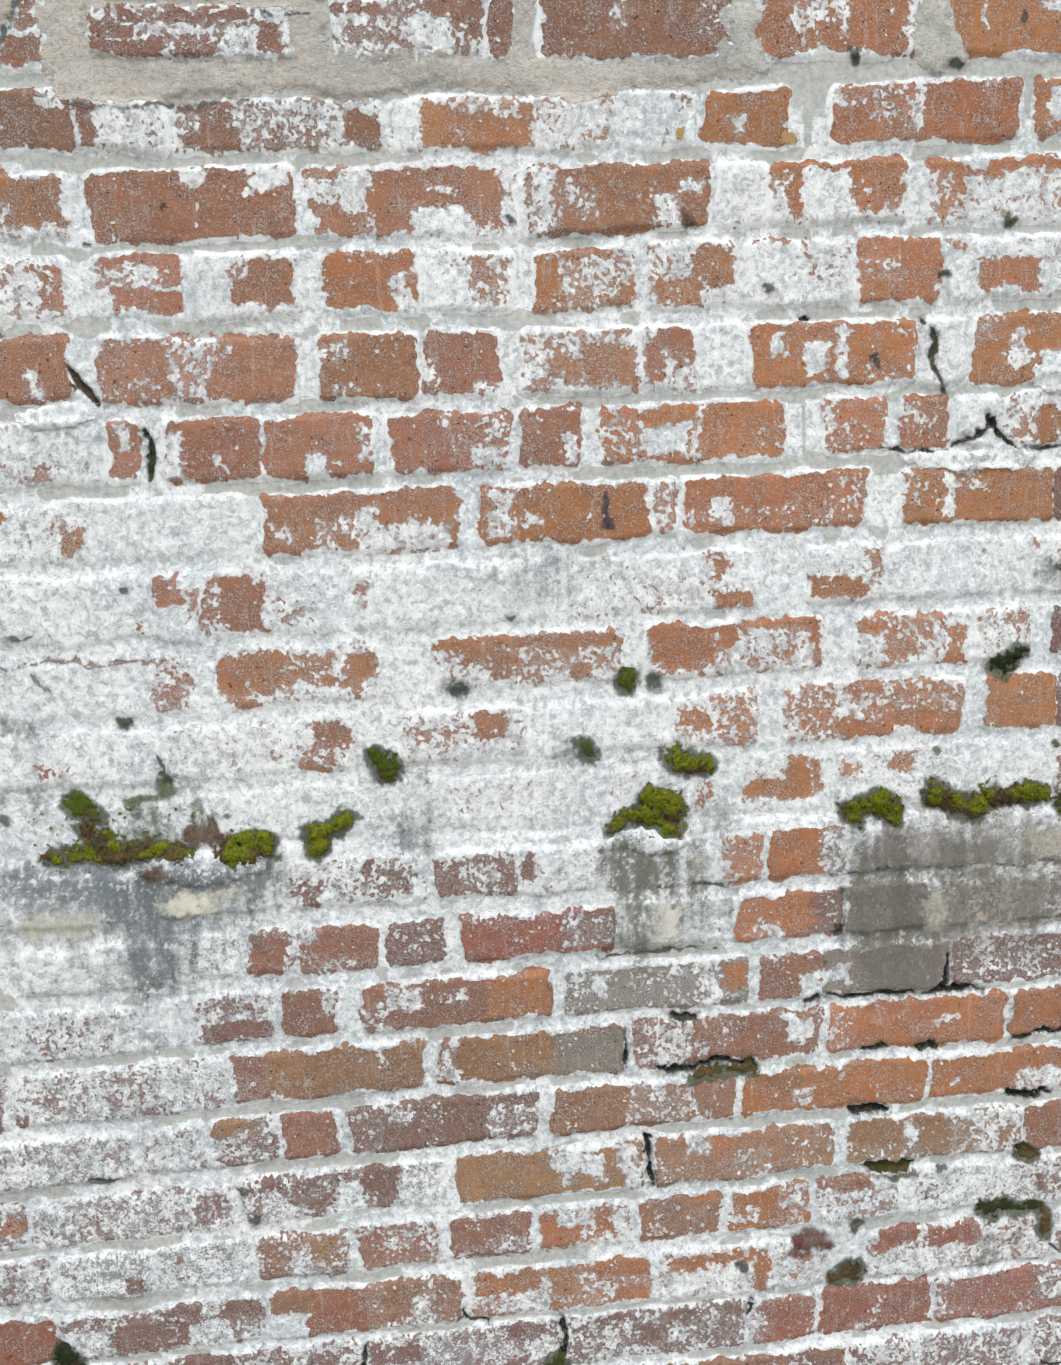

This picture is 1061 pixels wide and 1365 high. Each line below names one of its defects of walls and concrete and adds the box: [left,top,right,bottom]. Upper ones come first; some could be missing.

crack [0,0,21,43]
crack [920,318,946,393]
crack [67,364,100,406]
crack [881,413,1059,453]
water stain [446,679,470,698]
water stain [646,672,661,691]
water stain [116,718,133,729]
water stain [600,839,708,962]
water stain [834,811,1061,993]
water stain [0,855,288,999]
crack [643,1132,655,1185]
crack [360,1344,368,1365]